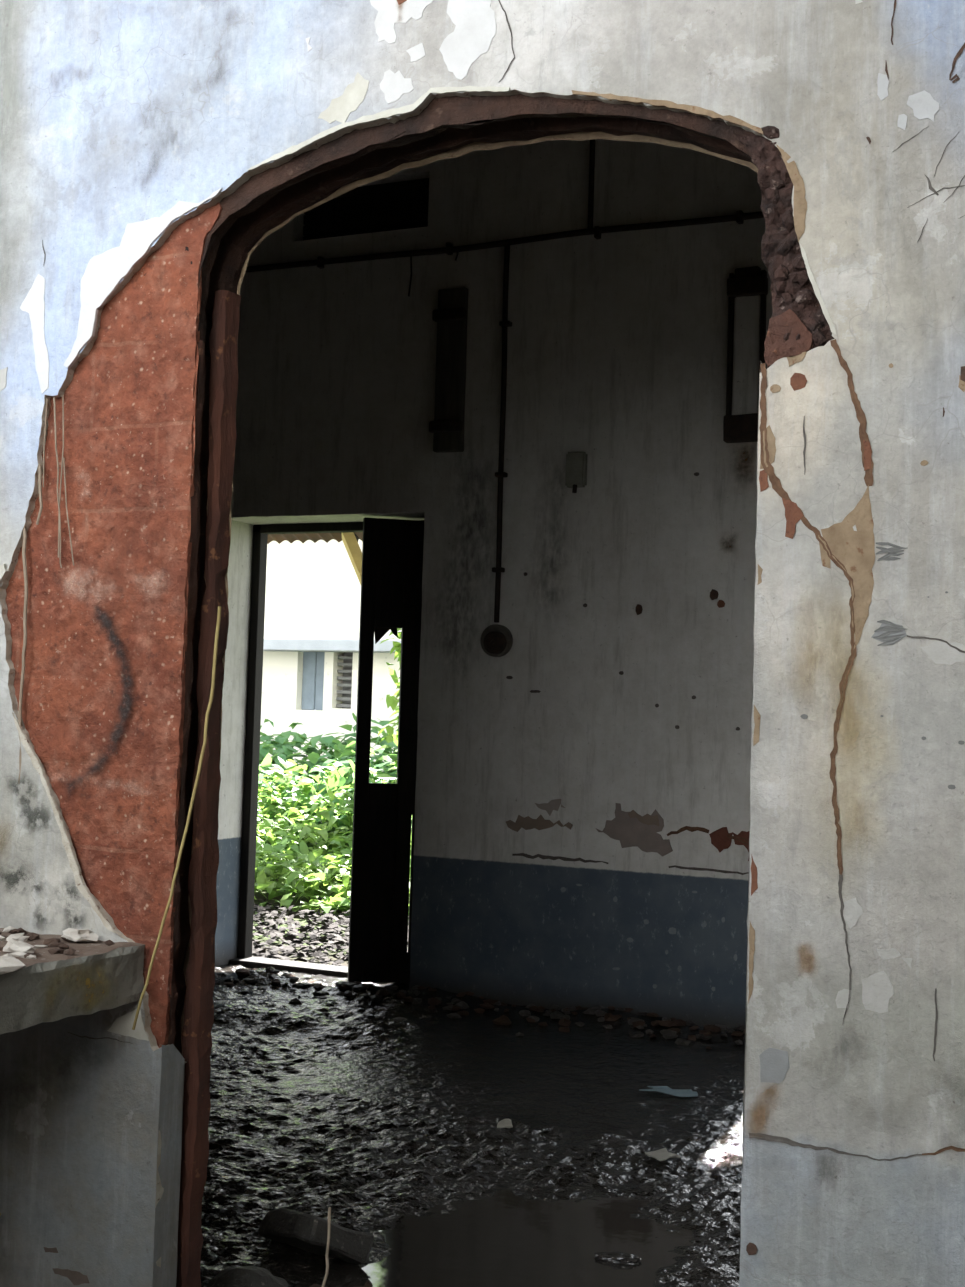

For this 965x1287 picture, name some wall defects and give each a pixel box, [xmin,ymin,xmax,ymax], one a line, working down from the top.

peeling [248,0,511,171]
crack [949,43,965,83]
spalling [0,188,222,1045]
crack [759,339,875,1021]
peeling [506,799,573,832]
peeling [596,803,758,896]
crack [749,1133,965,1161]